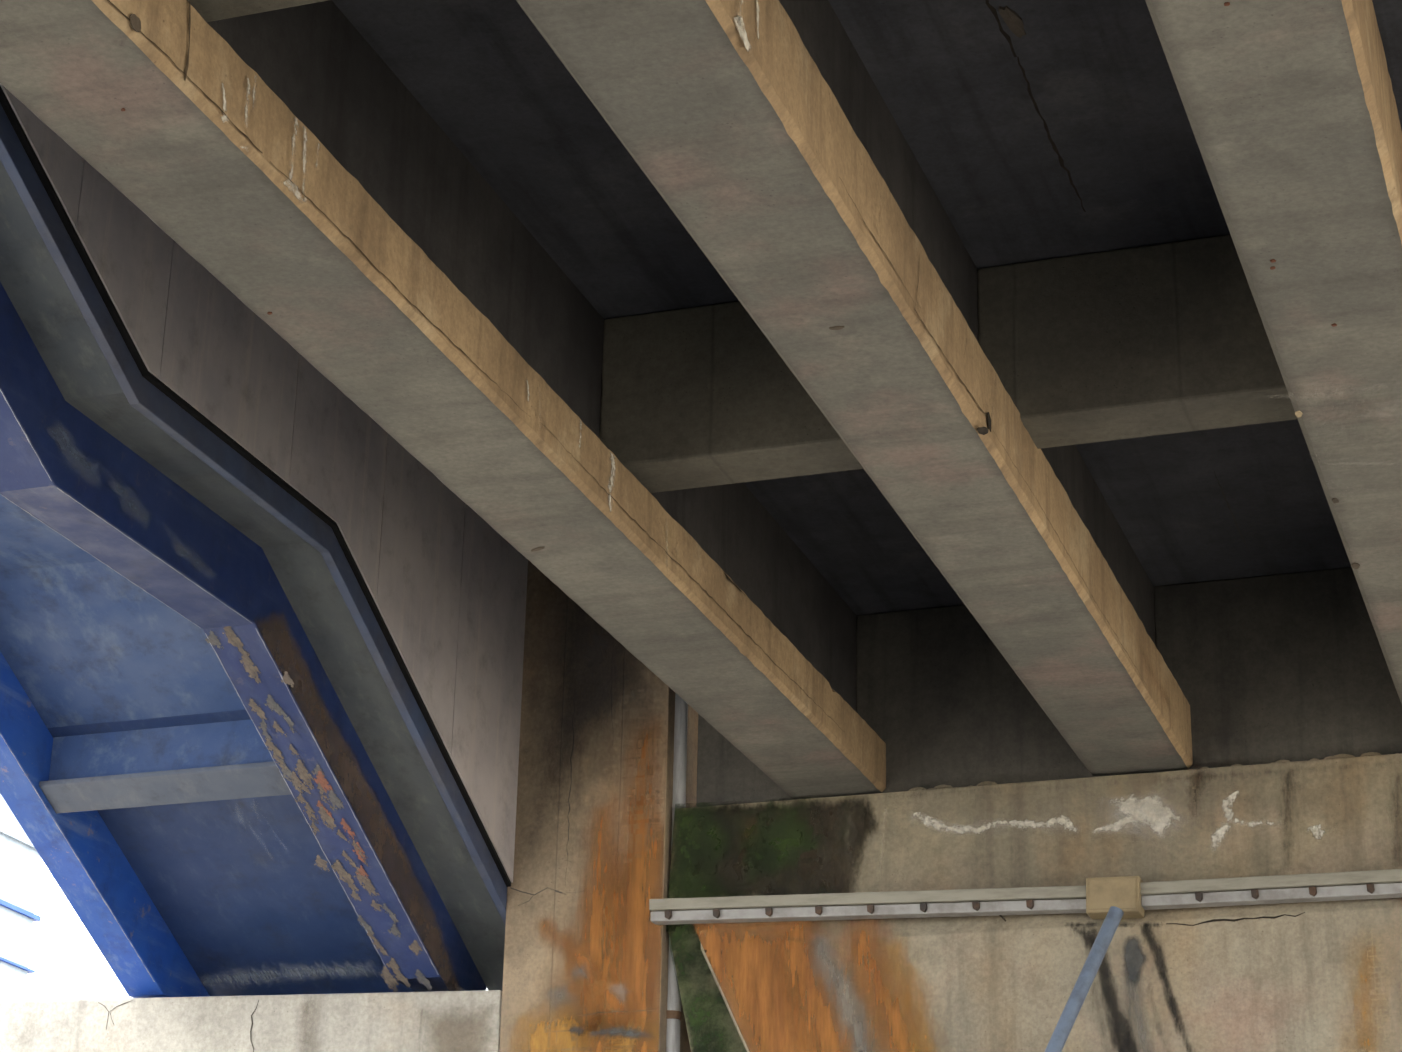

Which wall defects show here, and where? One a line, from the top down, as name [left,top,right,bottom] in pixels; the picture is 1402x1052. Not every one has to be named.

crack [985,0,1086,212]
efflorescence [914,812,1077,834]
efflorescence [1094,794,1180,837]
leakage [1211,791,1273,847]
corrosion [520,728,661,1052]
corrosion [693,921,889,1052]
leakage [815,939,870,1052]
leakage [1075,923,1191,1052]